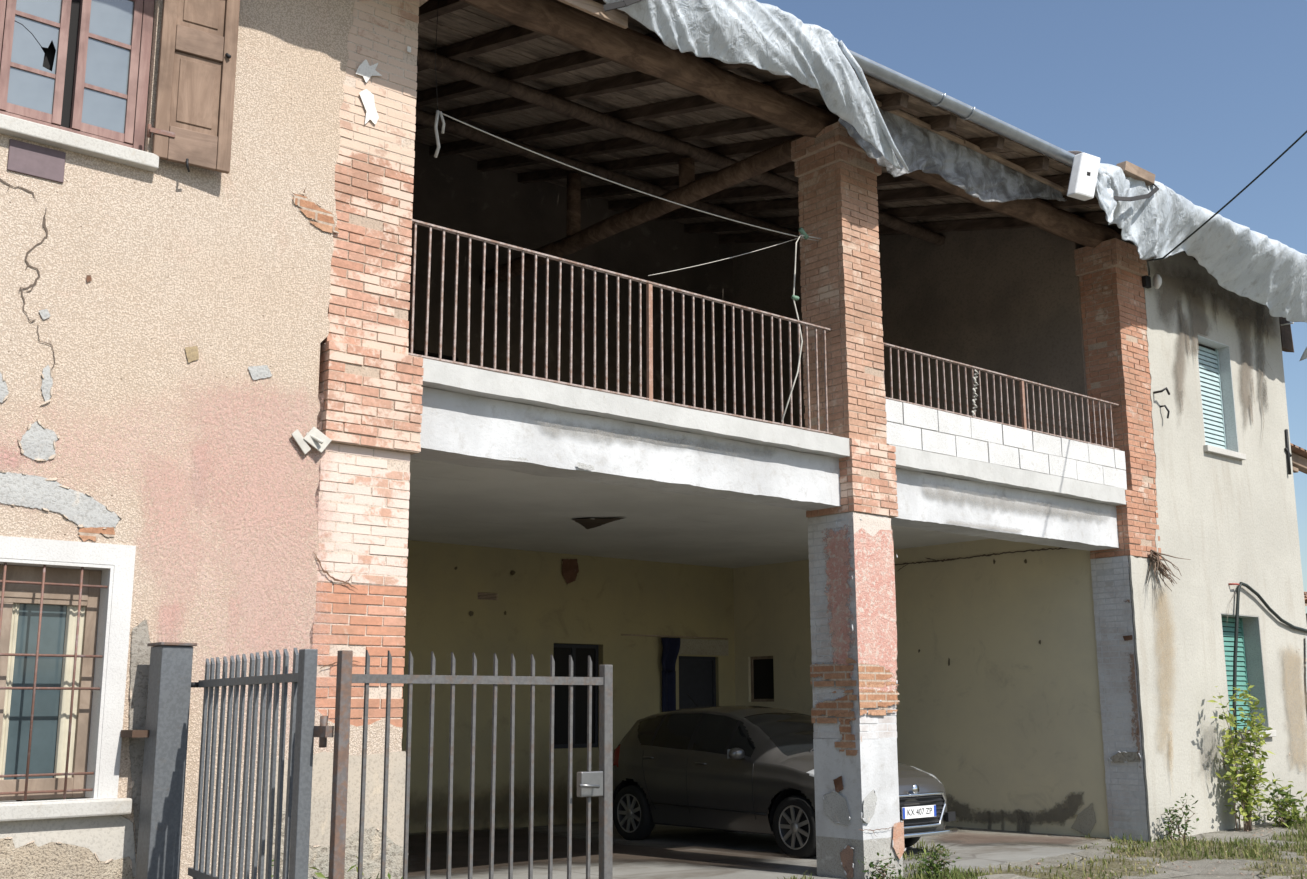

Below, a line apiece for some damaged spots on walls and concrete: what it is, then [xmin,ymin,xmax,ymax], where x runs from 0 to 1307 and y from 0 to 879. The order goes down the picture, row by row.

crack [0,178,58,378]
spalling [293,192,339,233]
damp [1157,265,1274,423]
peeling [0,365,122,542]
peeling [810,513,900,756]
peeling [823,776,878,826]
spalling [892,820,906,862]
damp [946,792,1083,832]